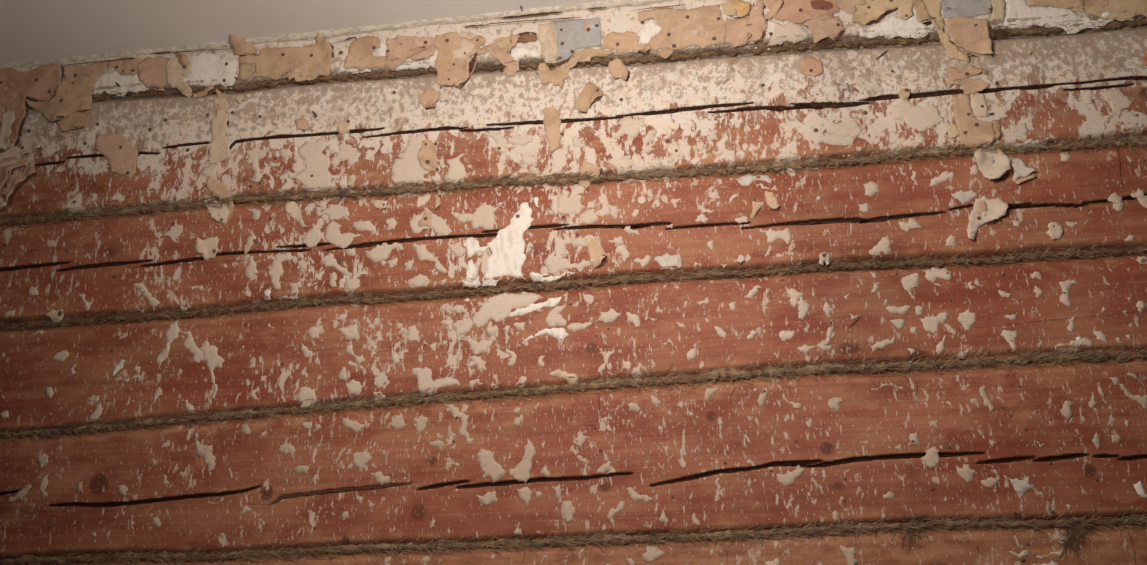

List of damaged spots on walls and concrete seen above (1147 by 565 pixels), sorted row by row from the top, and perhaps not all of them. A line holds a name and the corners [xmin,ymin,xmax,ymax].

crack [138,76,1147,155]
crack [35,154,104,166]
crack [0,229,500,272]
peeling [246,137,361,192]
peeling [245,202,501,300]
peeling [391,134,468,187]
peeling [545,194,701,274]
crack [527,204,974,232]
peeling [729,174,777,203]
peeling [911,171,978,205]
crack [1008,194,1147,209]
crack [0,451,1147,507]